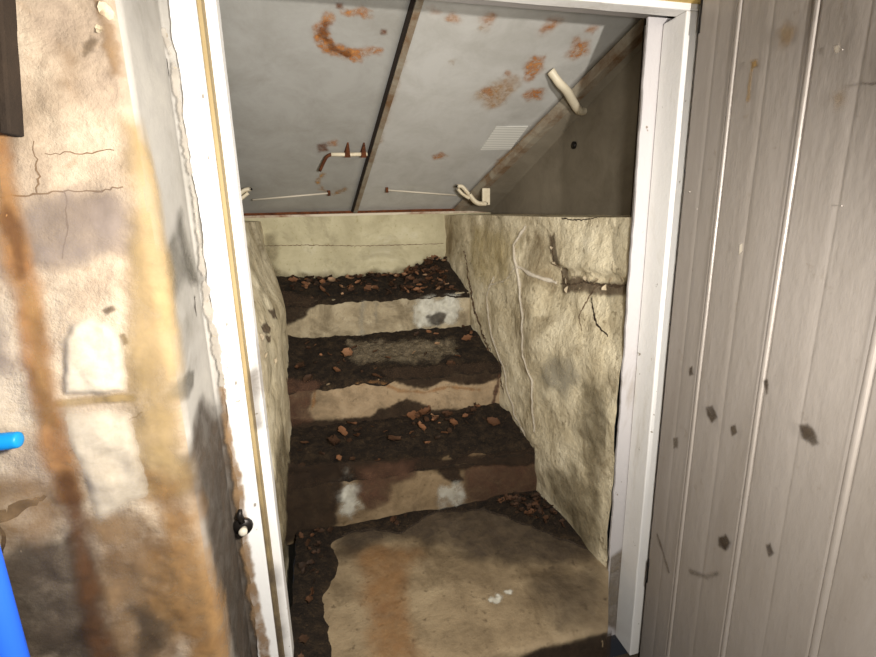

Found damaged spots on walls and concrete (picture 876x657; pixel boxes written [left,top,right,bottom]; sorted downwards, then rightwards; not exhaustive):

rust [314,16,382,62]
rust [525,56,542,99]
crack [14,141,123,236]
crack [578,281,608,337]